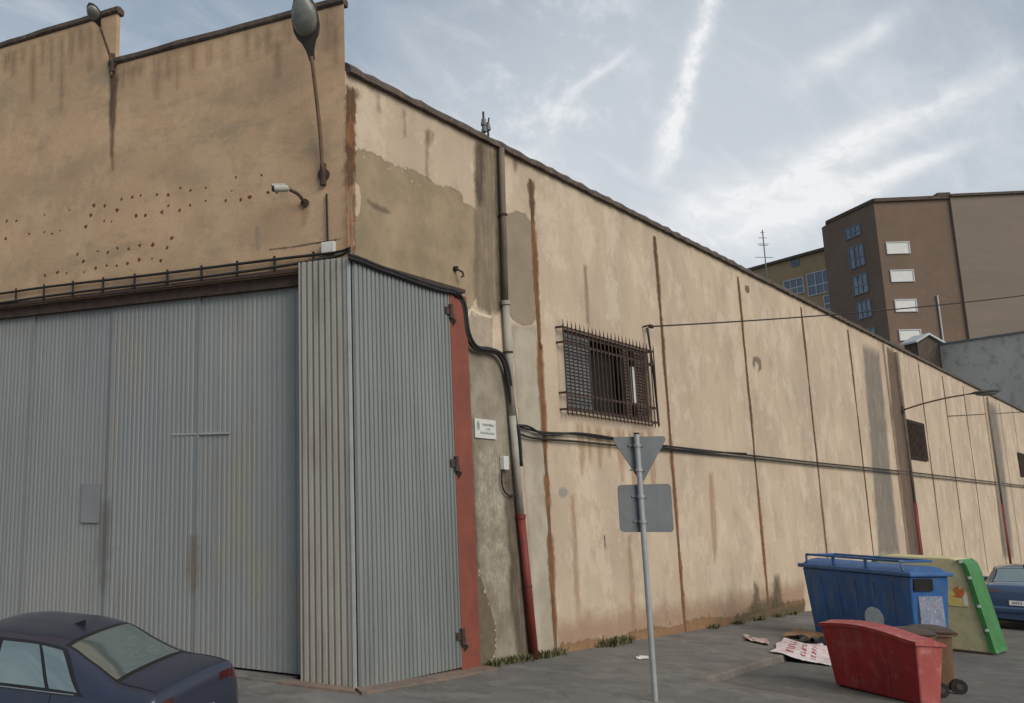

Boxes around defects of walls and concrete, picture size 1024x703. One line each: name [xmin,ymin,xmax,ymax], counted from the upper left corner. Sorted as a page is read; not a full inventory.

damp [110,67,118,154]
corrosion [345,89,356,257]
damp [475,143,502,313]
peeling [353,149,605,665]
corrosion [528,181,547,449]
corrosion [654,237,679,539]
damp [864,348,920,555]
corrosion [547,535,557,636]
flaking render [622,599,805,641]